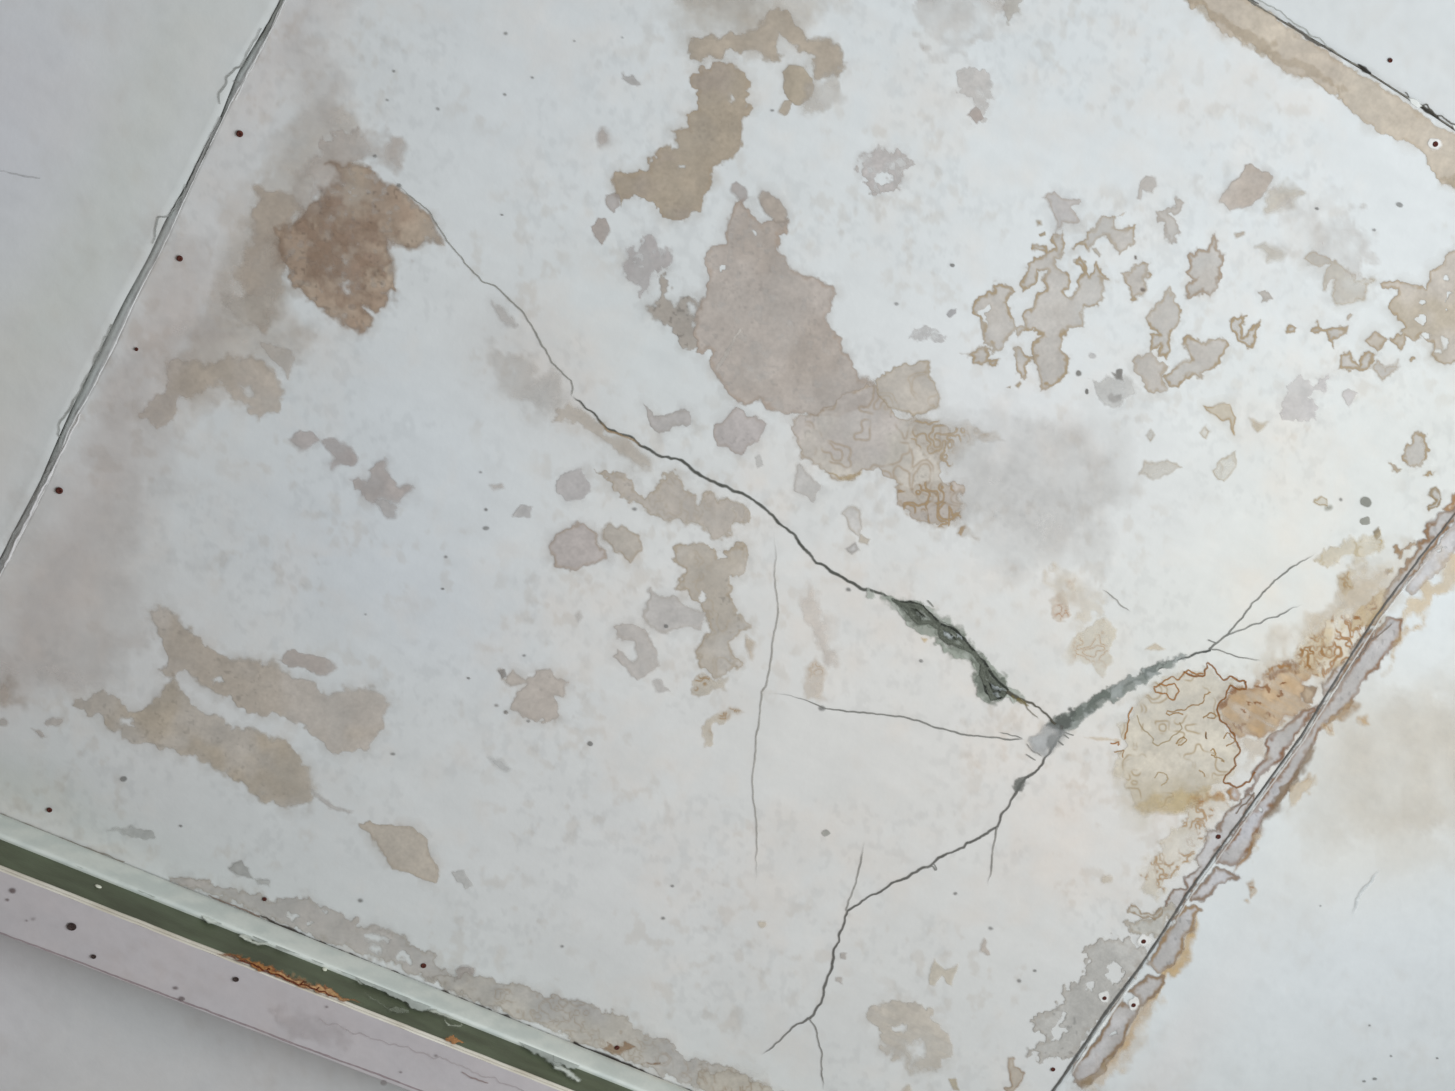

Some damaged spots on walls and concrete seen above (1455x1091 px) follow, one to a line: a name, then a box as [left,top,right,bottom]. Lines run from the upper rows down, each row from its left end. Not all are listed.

leakage [139,343,292,428]
crack [409,195,1307,1083]
leakage [1266,607,1377,680]
leakage [1110,662,1256,891]
peeling [1027,495,1455,1088]
crack [1052,514,1455,1091]
peeling [240,934,295,953]
rust [224,954,358,1002]
crack [208,895,400,974]
peeling [341,971,456,1026]
peeling [520,1042,580,1082]
crack [574,1041,691,1091]